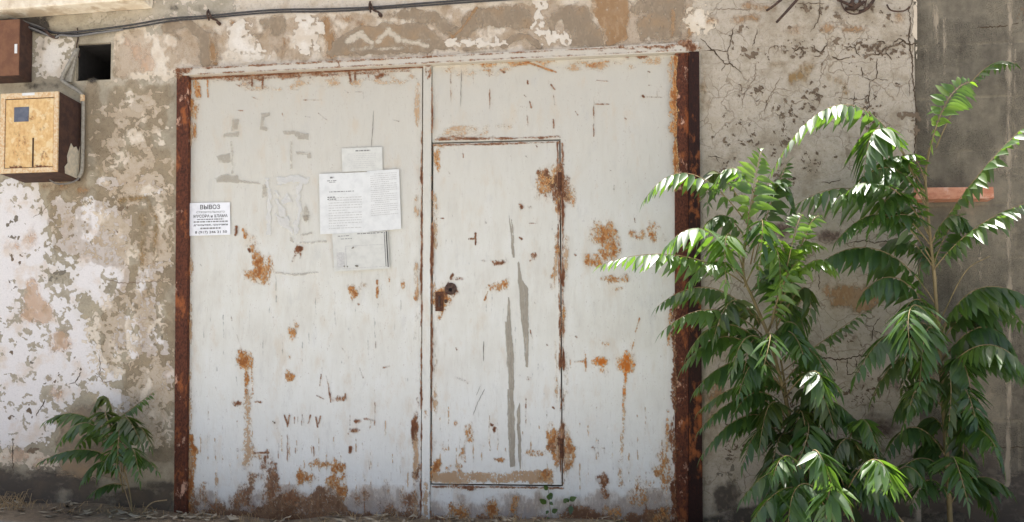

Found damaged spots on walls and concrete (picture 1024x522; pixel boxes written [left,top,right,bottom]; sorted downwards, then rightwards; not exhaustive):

peeling [292,10,325,56]
peeling [444,36,508,48]
peeling [530,0,572,47]
peeling [682,0,717,36]
crack [700,0,918,232]
peeling [0,0,271,471]
rust [173,39,702,522]